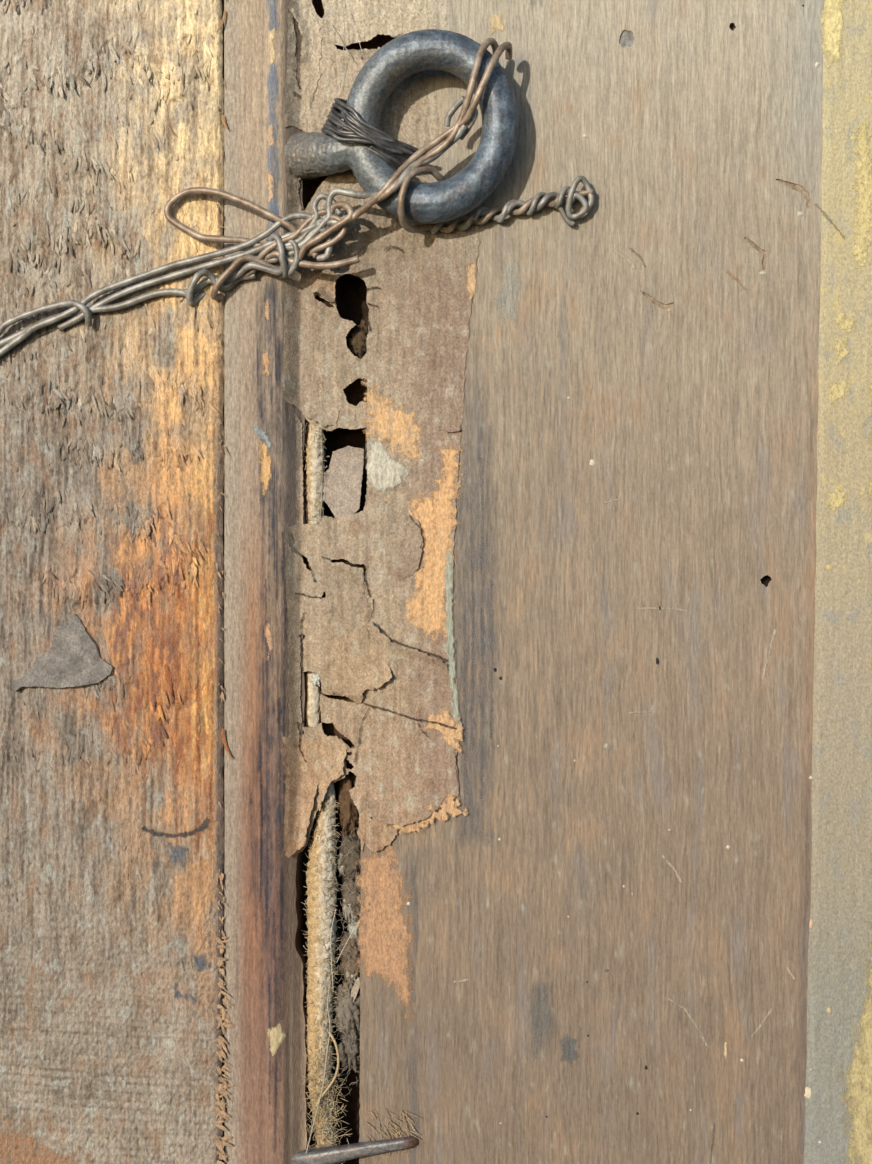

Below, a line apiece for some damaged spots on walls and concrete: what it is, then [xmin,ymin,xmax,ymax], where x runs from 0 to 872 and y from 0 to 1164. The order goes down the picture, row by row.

peeling [267,0,464,146]
peeling [379,70,471,183]
peeling [262,162,481,1018]